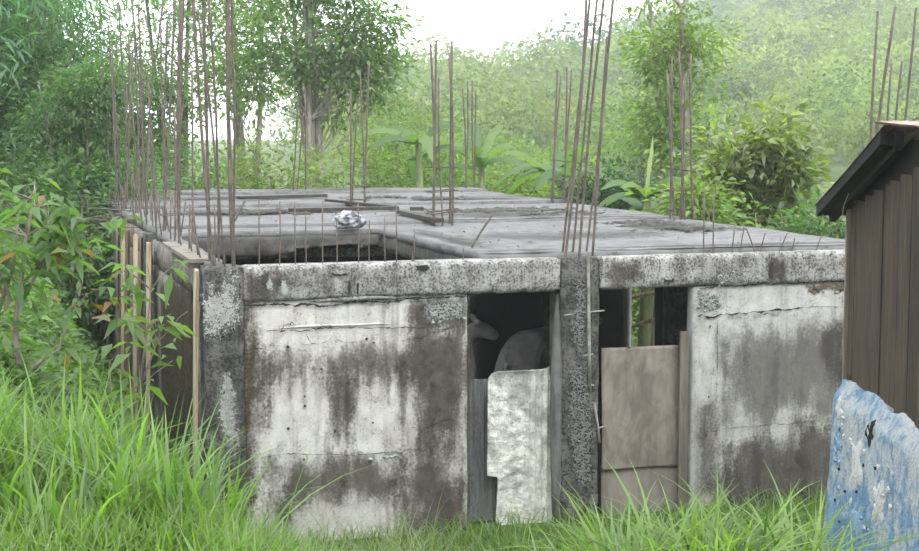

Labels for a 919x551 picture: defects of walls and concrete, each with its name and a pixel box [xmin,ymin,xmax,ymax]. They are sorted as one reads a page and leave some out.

leakage [216,272,479,535]
crack [238,283,467,351]
crack [697,281,843,401]
leakage [707,322,843,508]
peeling [827,395,893,551]